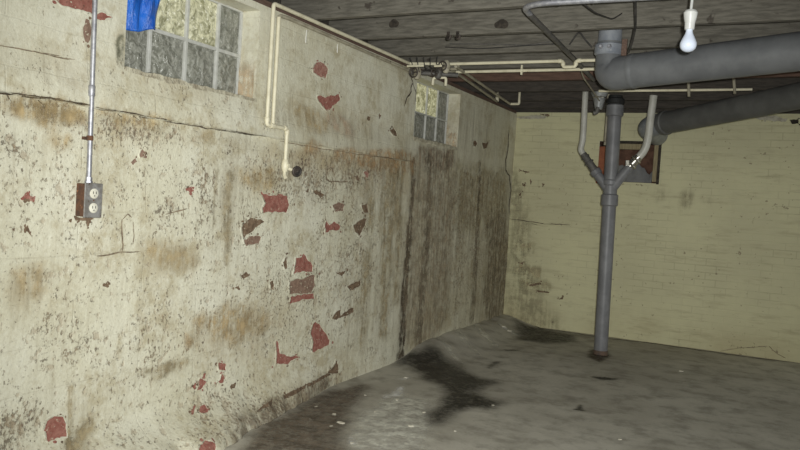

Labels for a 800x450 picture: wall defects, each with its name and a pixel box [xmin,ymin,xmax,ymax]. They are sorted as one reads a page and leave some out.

peeling [311,60,328,80]
crack [0,91,261,136]
peeling [316,92,342,112]
crack [505,134,565,225]
peeling [240,190,295,247]
peeling [282,253,321,305]
leakage [380,150,498,421]
leakage [484,219,570,342]
peeling [272,339,300,368]
peeling [309,306,354,354]
peeling [40,414,69,443]